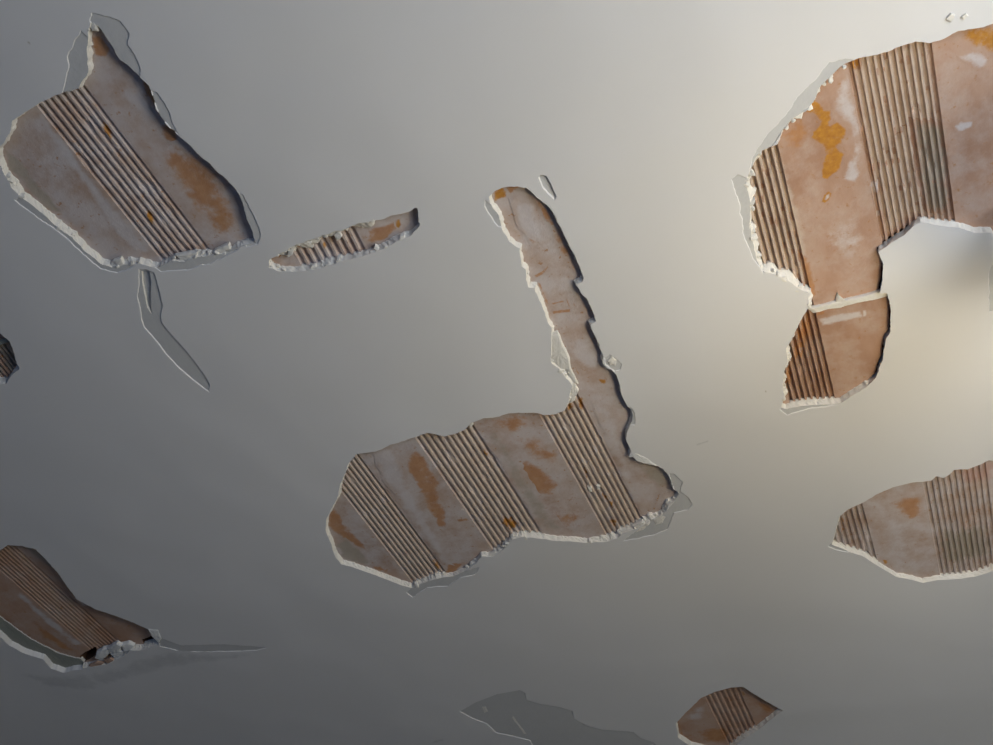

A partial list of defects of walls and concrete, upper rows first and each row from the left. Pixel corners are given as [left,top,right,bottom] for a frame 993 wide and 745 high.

spalling [0,13,261,392]
spalling [269,208,420,272]
spalling [731,13,993,415]
spalling [326,175,692,597]
spalling [828,460,993,583]
spalling [0,545,267,673]
spalling [676,687,783,745]